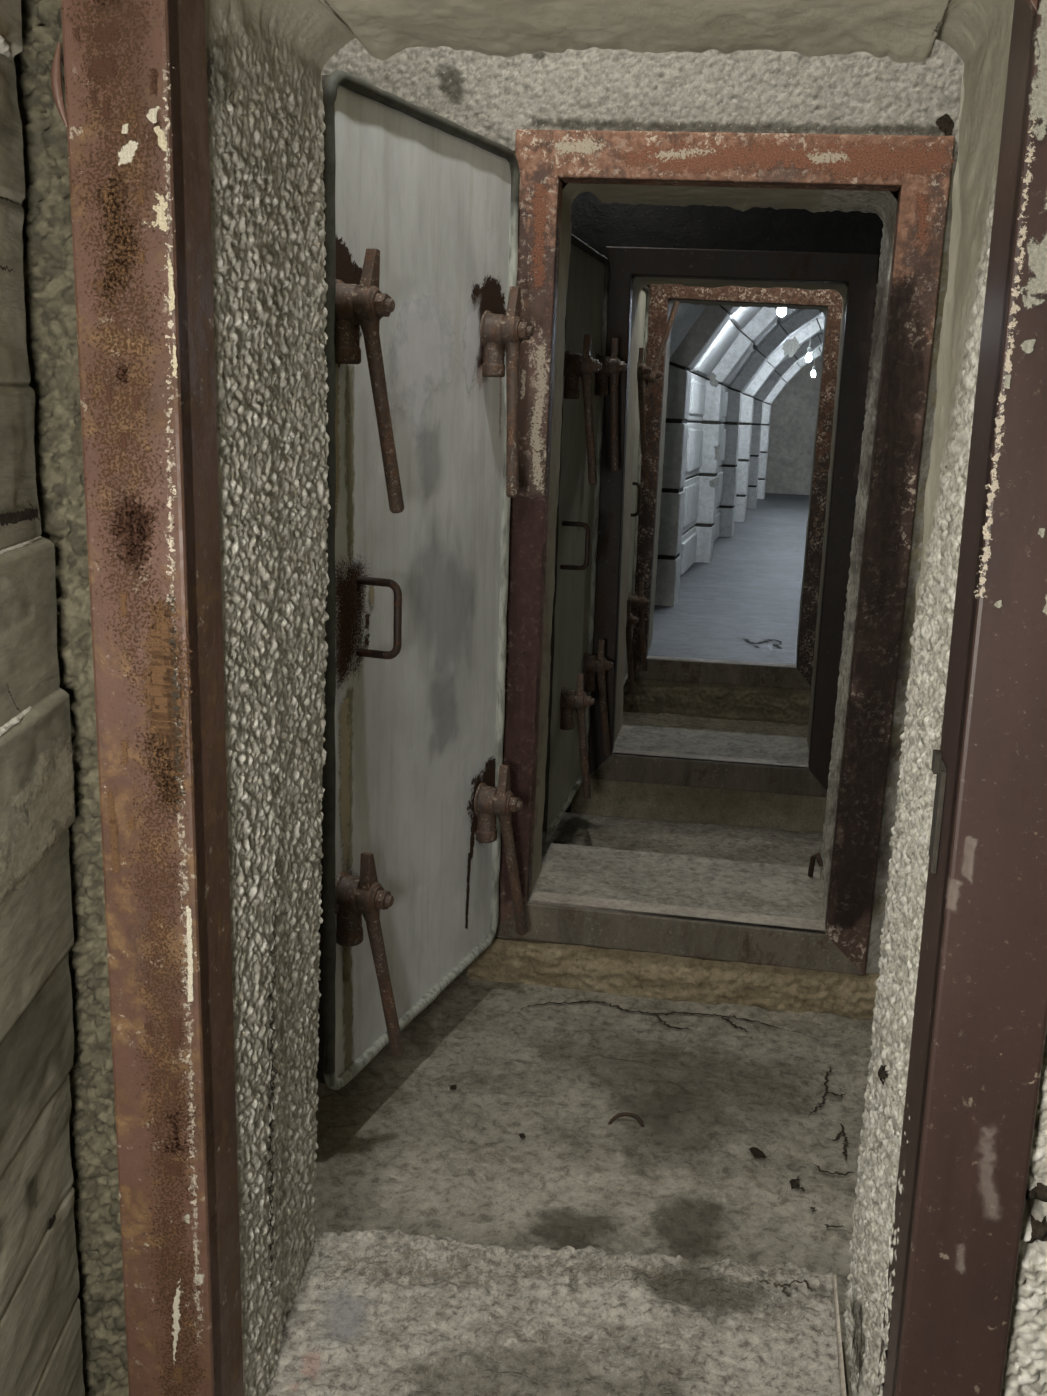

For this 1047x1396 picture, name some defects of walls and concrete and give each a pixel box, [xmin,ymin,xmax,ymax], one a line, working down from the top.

peeling [1029,0,1047,140]
peeling [118,123,140,166]
peeling [146,106,168,152]
peeling [144,191,168,232]
rust [614,135,957,248]
peeling [167,254,175,311]
peeling [1020,234,1047,309]
rust [828,281,923,928]
crack [521,1000,804,1034]
crack [793,1066,853,1228]
damp [533,1212,609,1248]
damp [648,1200,760,1311]